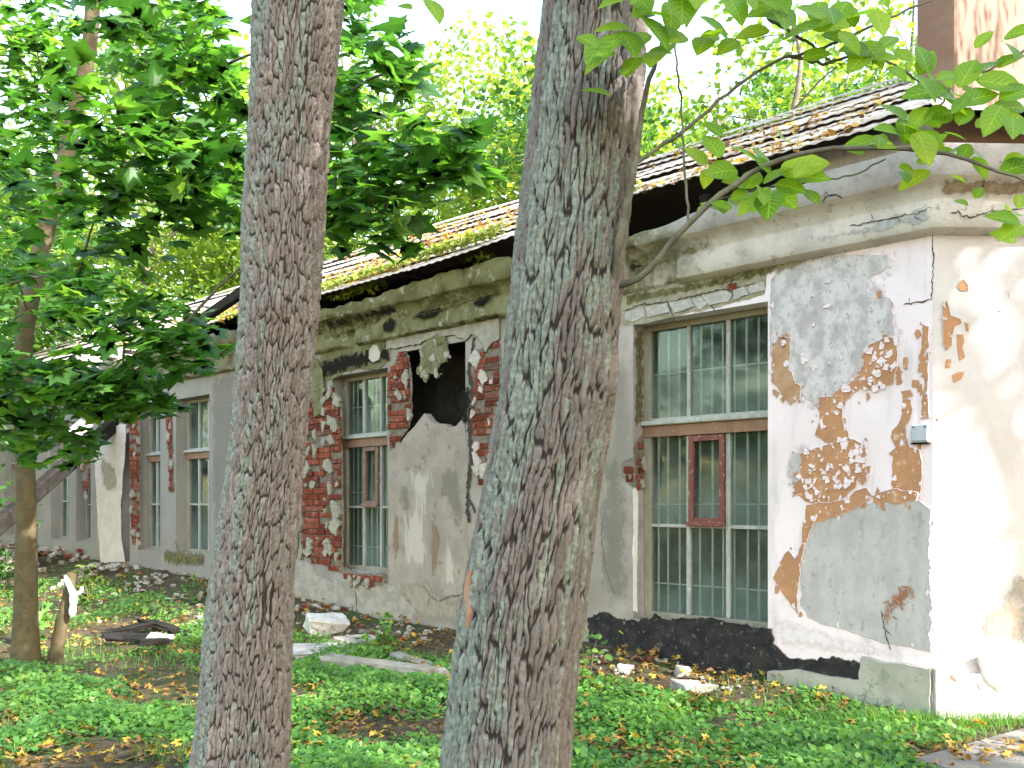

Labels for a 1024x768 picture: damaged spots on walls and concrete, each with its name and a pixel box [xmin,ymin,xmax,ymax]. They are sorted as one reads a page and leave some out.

crack [850,181,1024,305]
damp [322,348,389,378]
damp [425,313,499,332]
flaking render [126,415,141,549]
flaking render [165,416,175,493]
flaking render [297,307,502,590]
peeling [620,253,969,652]
flaking render [587,433,860,679]